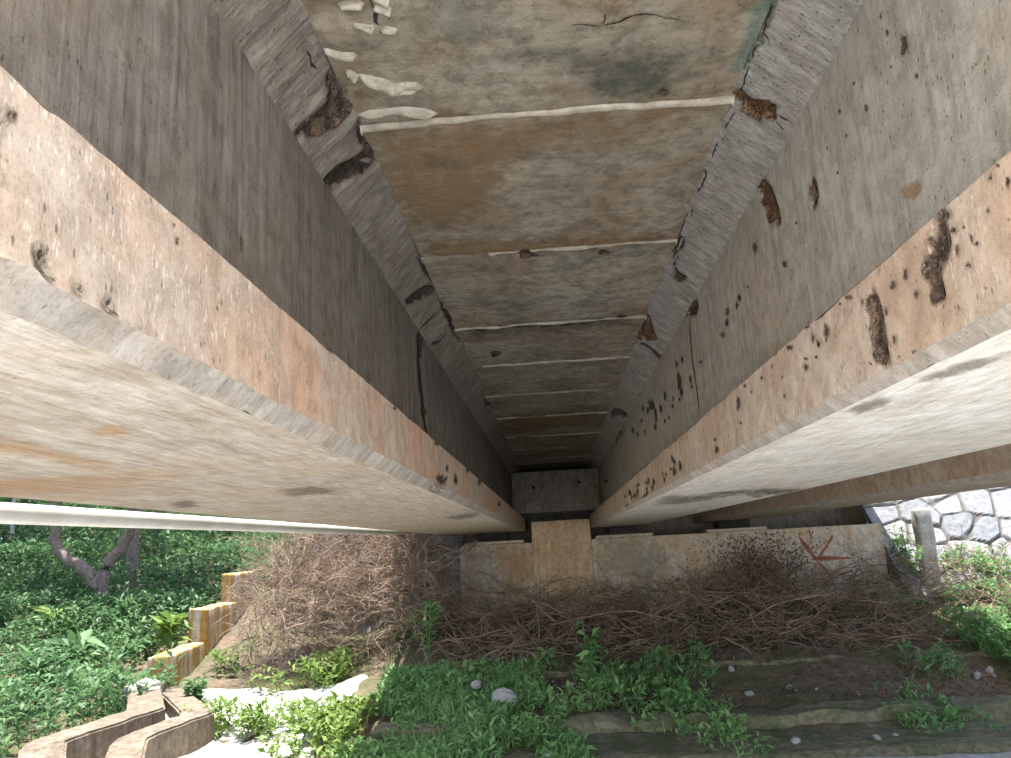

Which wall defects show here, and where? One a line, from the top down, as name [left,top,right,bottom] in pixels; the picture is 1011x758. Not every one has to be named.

crack [572,13,684,27]
crack [740,5,772,90]
spalling [294,66,353,137]
spalling [734,90,789,130]
spalling [323,122,374,188]
crack [691,113,735,215]
spalling [758,179,781,226]
spalling [809,177,819,209]
spalling [406,257,460,340]
spalling [471,314,662,361]